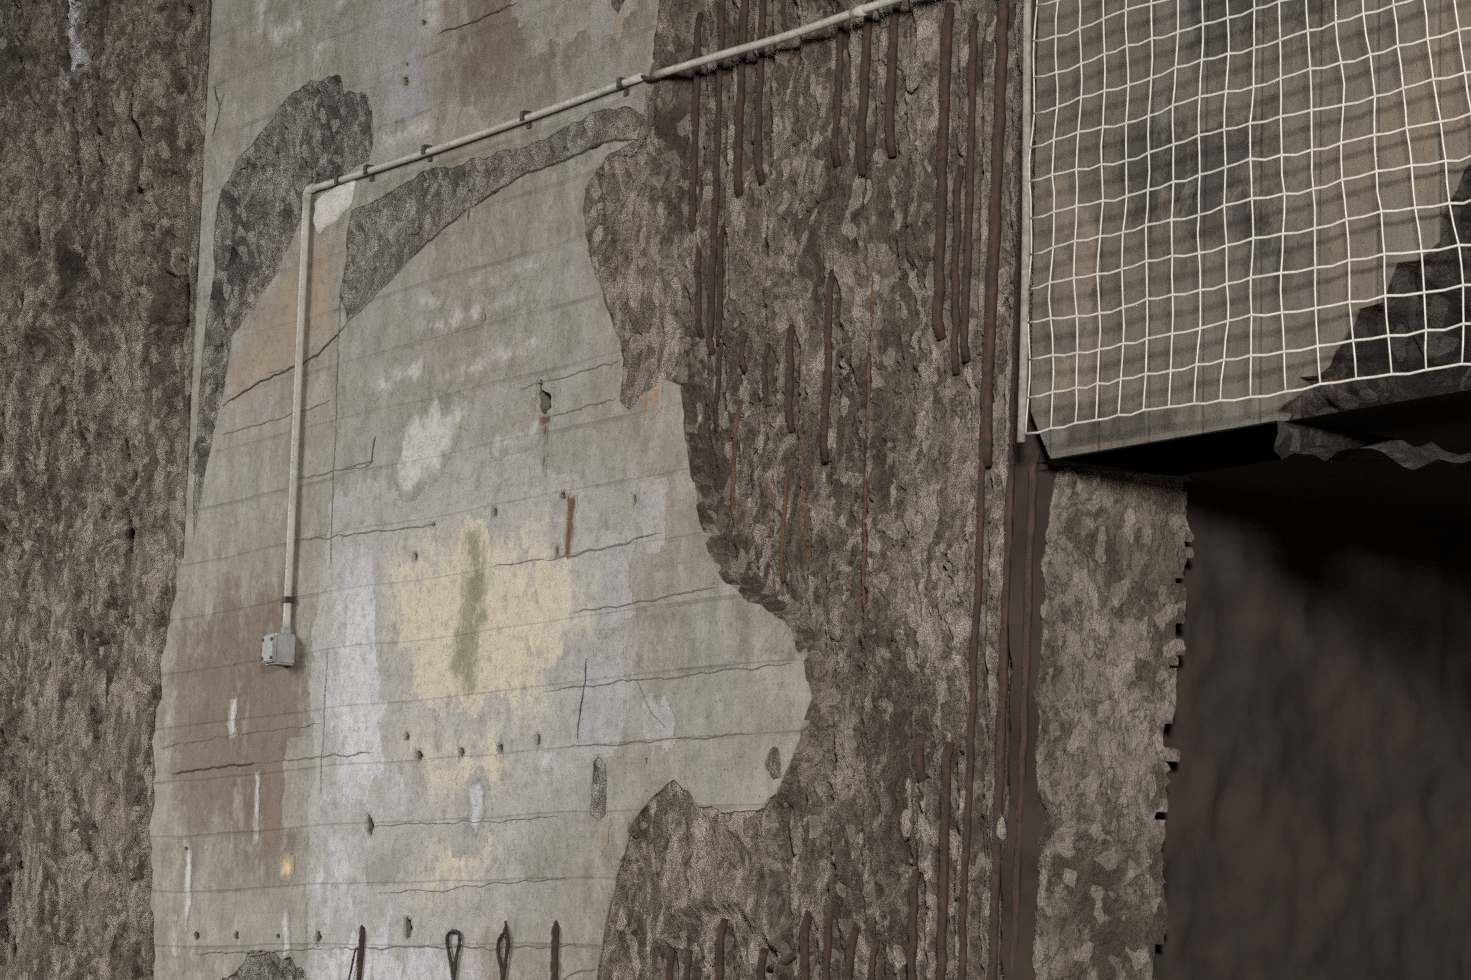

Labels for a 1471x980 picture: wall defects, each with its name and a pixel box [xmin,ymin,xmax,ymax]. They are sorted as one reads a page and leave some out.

leakage [51,0,96,263]
spalling [0,0,374,980]
leakage [152,223,693,980]
leakage [457,165,561,238]
rust [554,492,579,559]
spalling [339,0,1194,980]